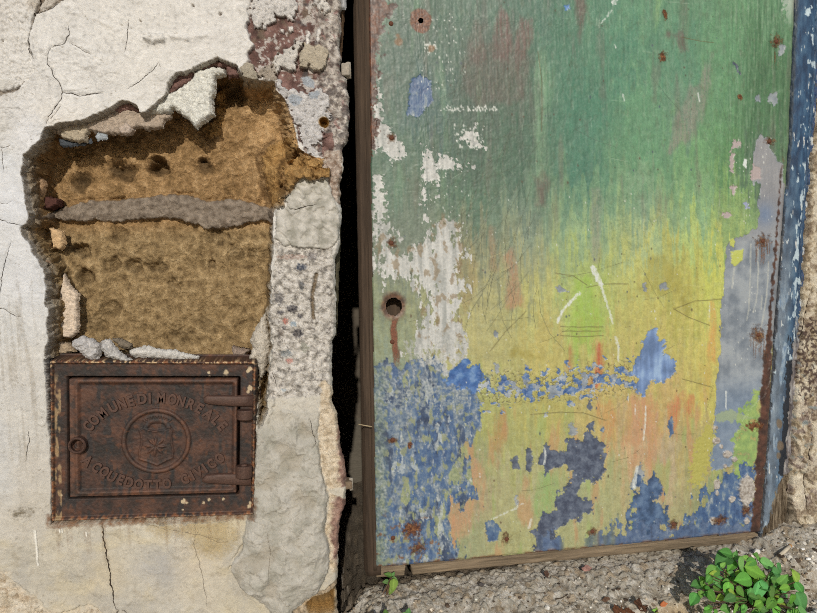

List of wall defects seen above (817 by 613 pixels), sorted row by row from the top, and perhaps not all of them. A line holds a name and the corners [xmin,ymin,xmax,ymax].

crack [28,0,98,123]
peeling [370,72,407,167]
peeling [407,74,434,117]
peeling [456,123,488,151]
spalling [21,0,350,613]
corrosion [390,319,399,362]
peeling [371,143,677,567]
peeling [587,134,786,548]
crack [102,527,124,613]